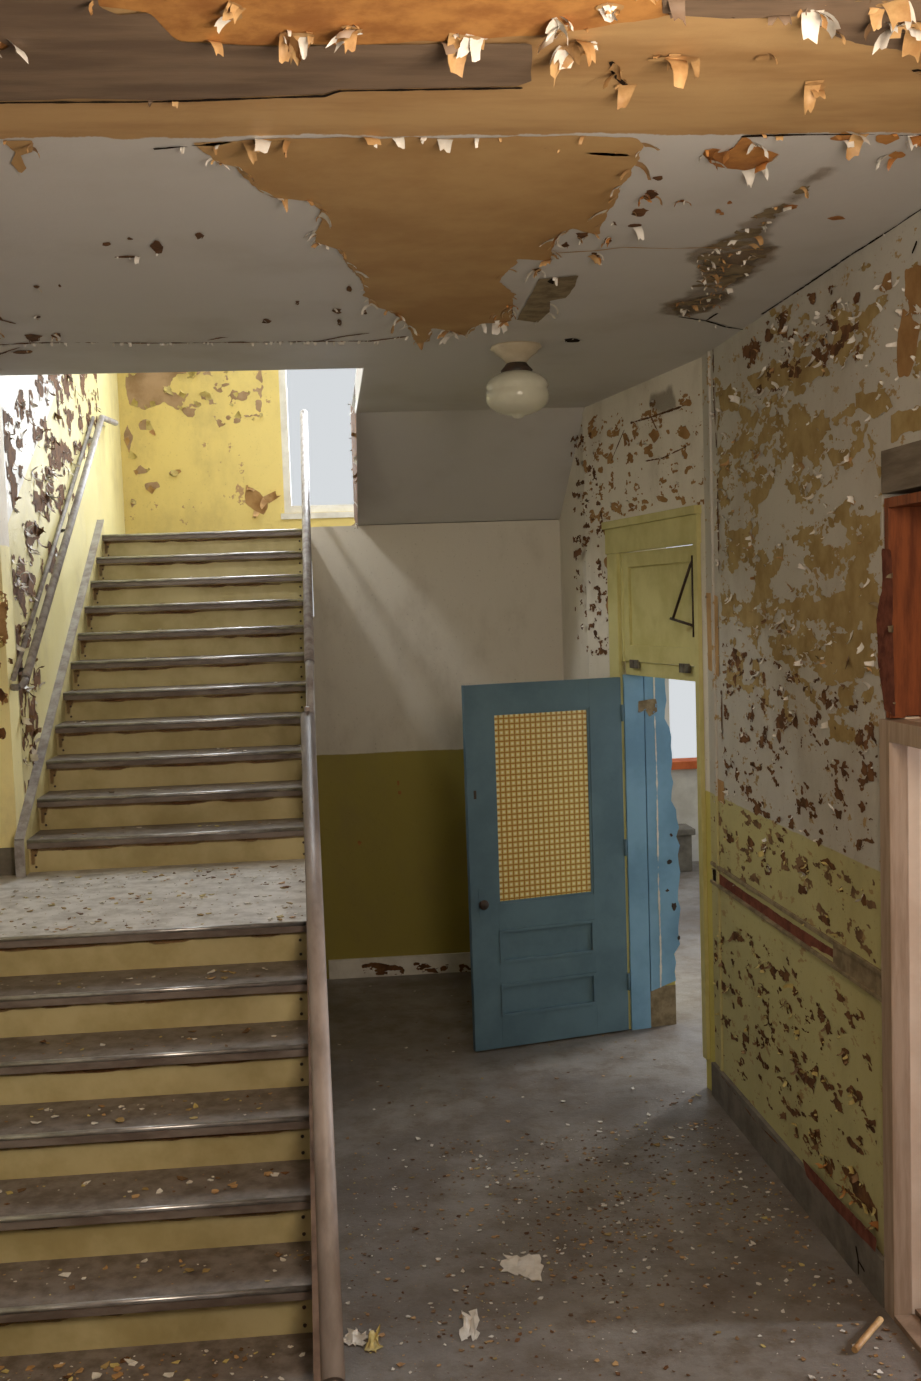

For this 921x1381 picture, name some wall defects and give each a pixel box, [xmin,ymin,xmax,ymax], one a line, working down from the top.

peeling [0,0,921,114]
peeling [3,140,40,173]
peeling [699,137,779,188]
peeling [830,132,921,171]
peeling [103,237,163,265]
peeling [194,135,691,350]
peeling [672,186,810,317]
peeling [0,315,61,354]
peeling [124,370,263,507]
peeling [0,374,104,793]
peeling [570,261,921,963]
peeling [713,927,879,1251]